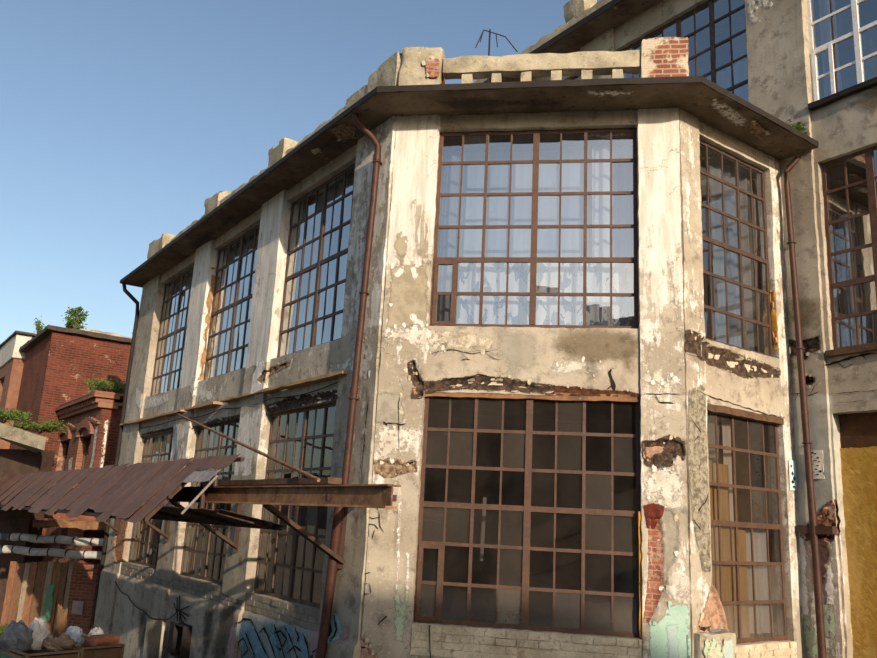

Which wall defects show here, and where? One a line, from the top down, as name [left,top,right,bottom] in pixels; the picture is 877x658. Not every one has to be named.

peeling [747,0,773,23]
peeling [385,198,494,355]
spalling [250,360,338,413]
spalling [374,356,640,478]
water stain [559,333,635,358]
peeling [641,369,681,387]
spalling [684,329,781,379]
peeling [394,495,410,642]
spalling [641,385,734,658]
spalling [799,499,840,658]